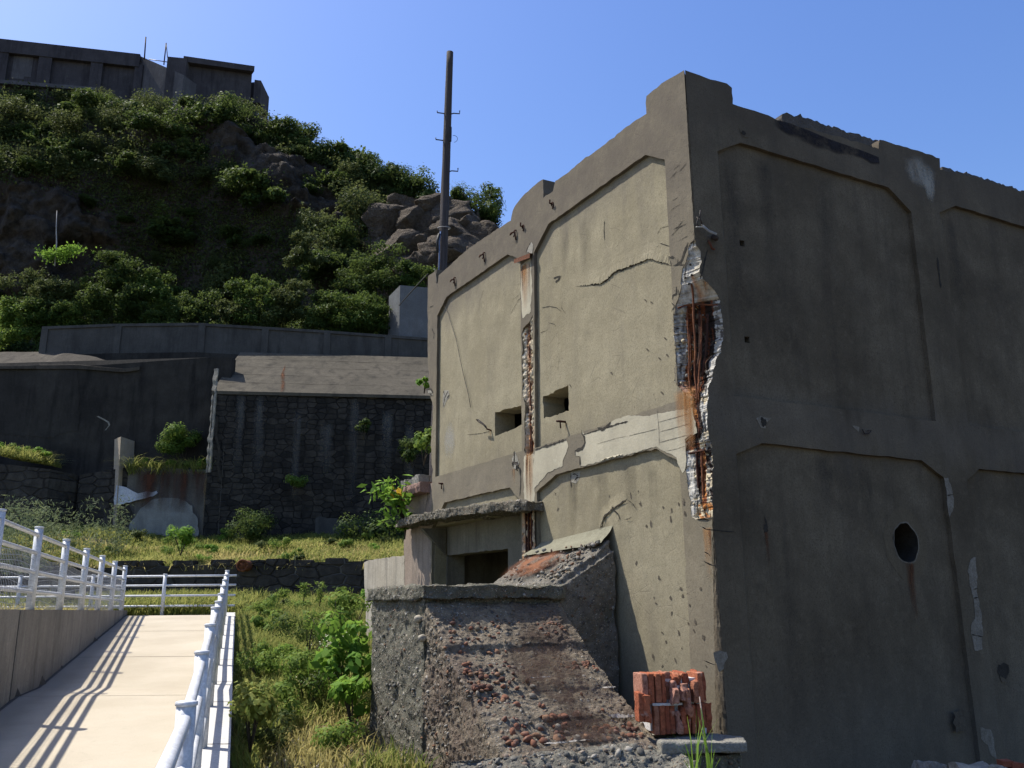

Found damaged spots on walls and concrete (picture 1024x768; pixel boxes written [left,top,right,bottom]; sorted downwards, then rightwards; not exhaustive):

crack [577,165,708,312]
spalling [512,240,724,561]
peeling [944,478,954,517]
peeling [968,557,983,651]